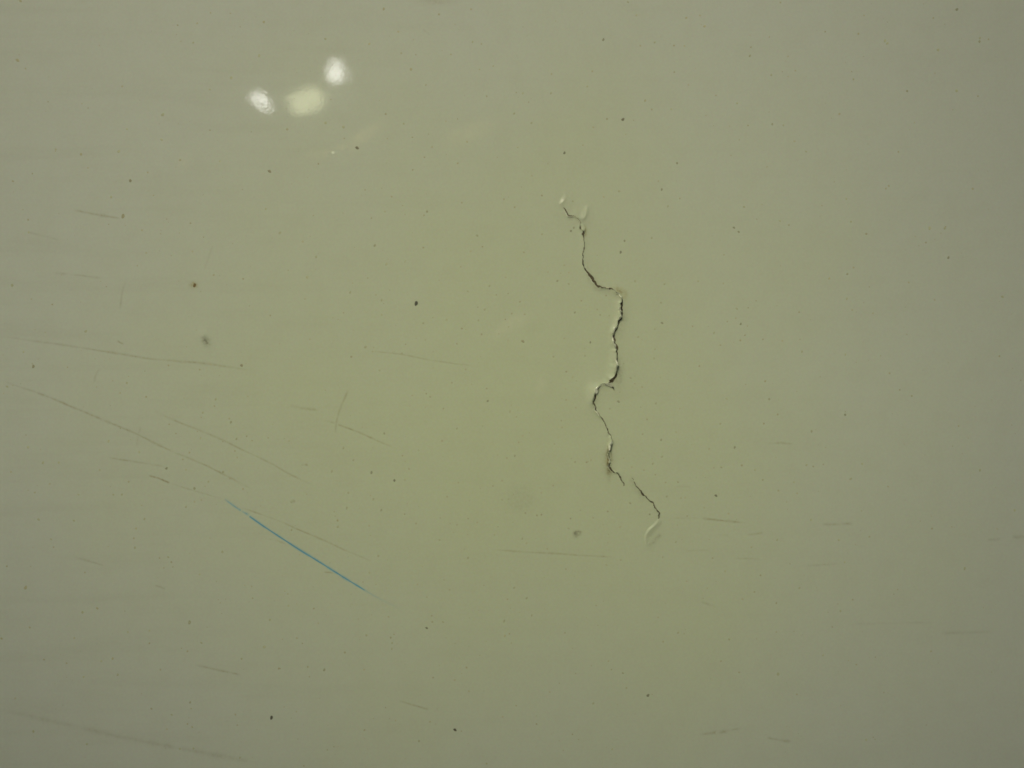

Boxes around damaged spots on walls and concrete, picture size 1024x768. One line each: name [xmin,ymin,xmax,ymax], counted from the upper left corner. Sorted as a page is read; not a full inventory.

crack [550,194,674,550]